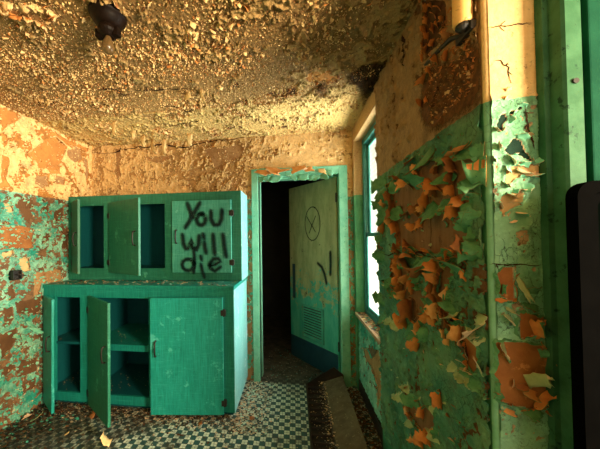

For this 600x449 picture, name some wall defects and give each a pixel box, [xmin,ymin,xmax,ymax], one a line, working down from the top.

spalling [406,0,476,124]
crack [493,21,527,31]
spalling [494,102,529,132]
peeling [0,0,393,425]
peeling [370,132,557,423]
peeling [391,377,456,449]